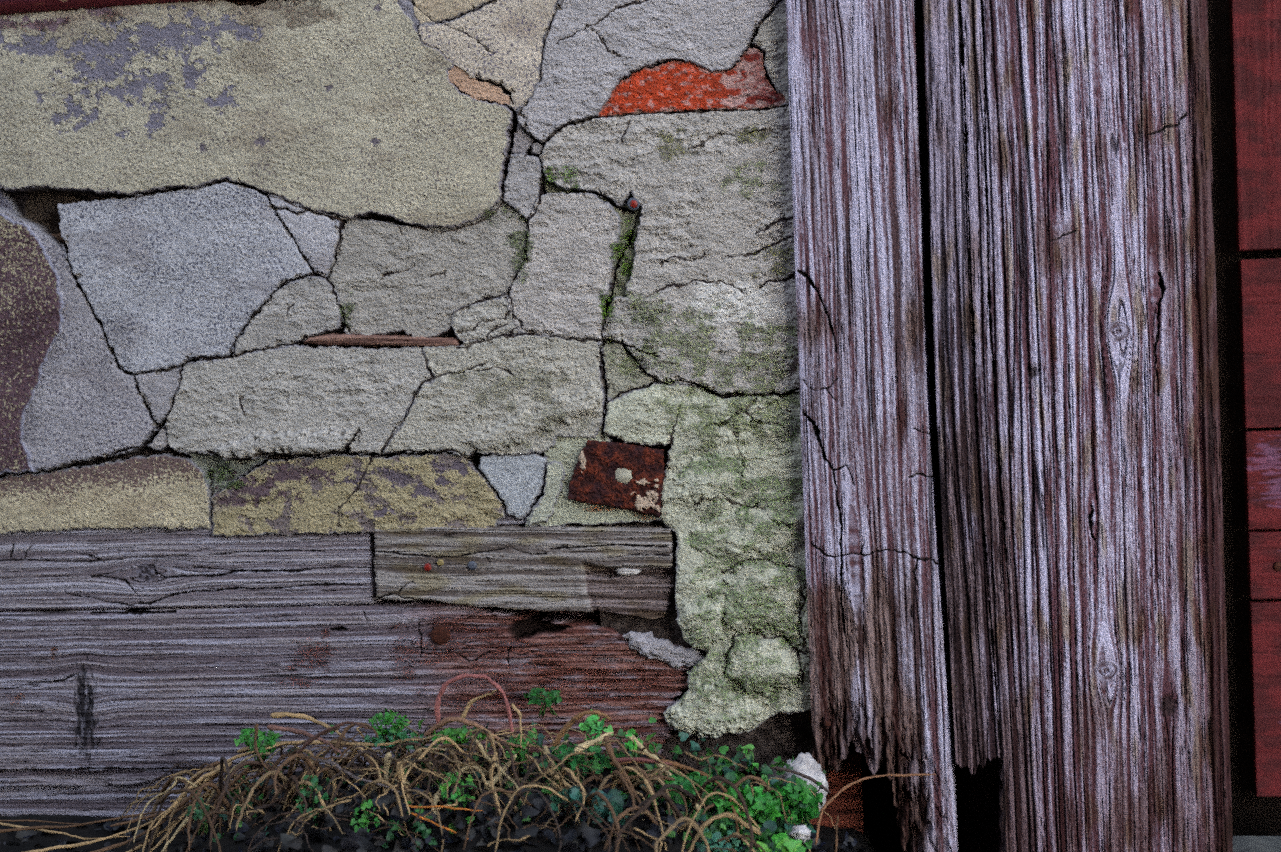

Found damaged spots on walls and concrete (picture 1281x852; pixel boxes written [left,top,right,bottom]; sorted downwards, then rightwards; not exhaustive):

peeling [0,0,287,140]
spalling [599,47,786,118]
spalling [1,188,83,246]
crack [0,0,938,685]
rust [578,450,587,473]
rust [631,478,661,519]